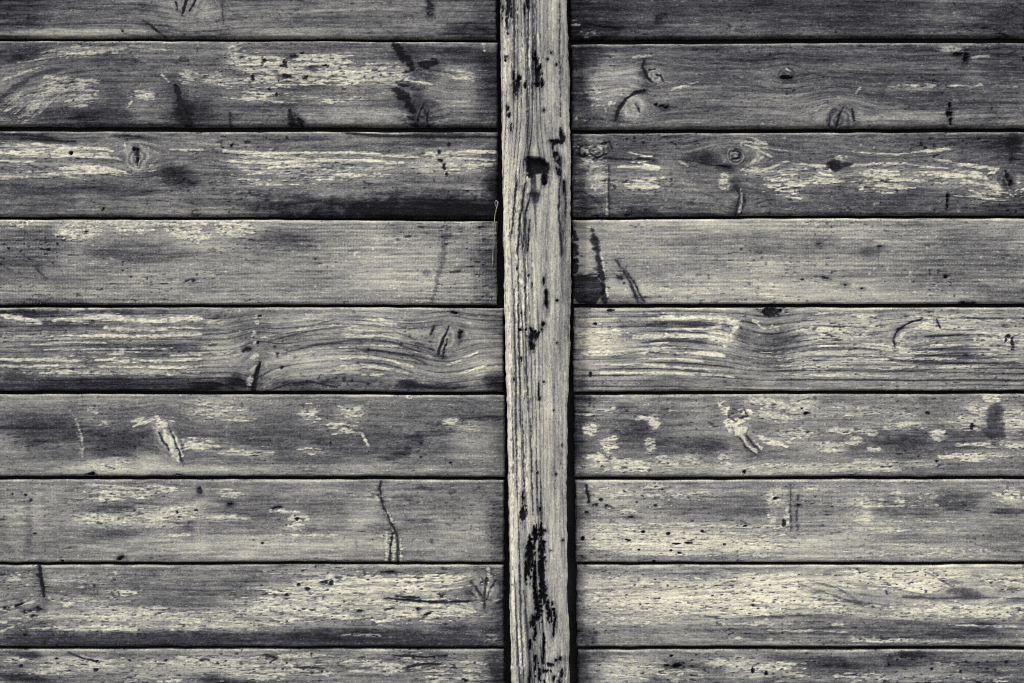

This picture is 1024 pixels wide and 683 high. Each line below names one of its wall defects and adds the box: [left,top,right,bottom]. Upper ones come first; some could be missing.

crack [383,0,665,683]
crack [157,427,184,464]
crack [727,408,762,455]
crack [376,480,401,562]
peeling [574,394,1024,644]
crack [67,651,101,665]
crack [265,654,325,670]